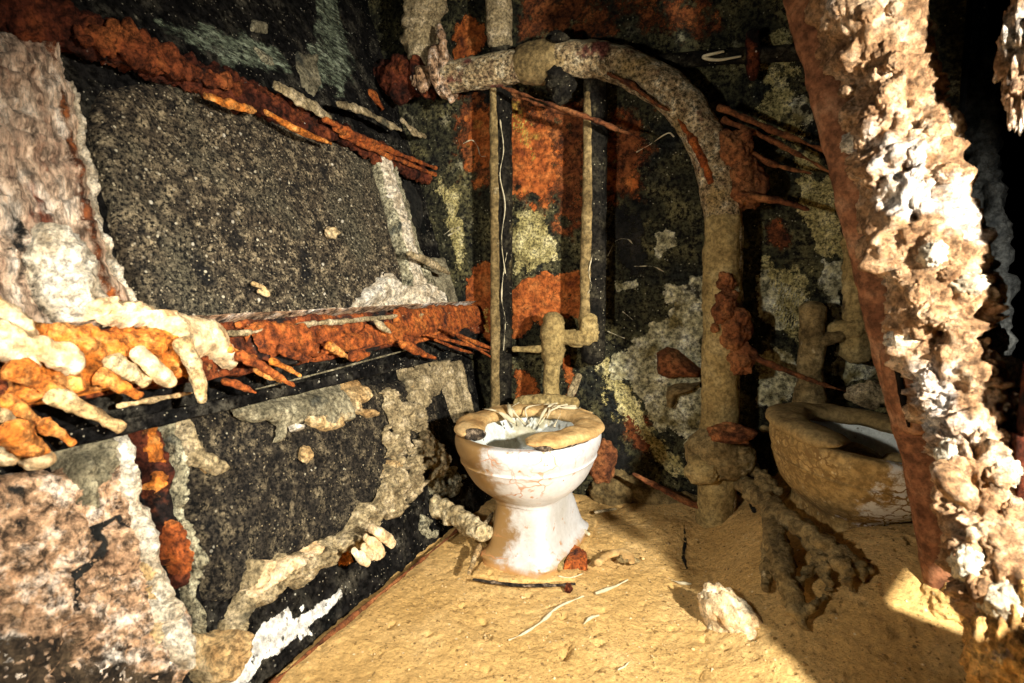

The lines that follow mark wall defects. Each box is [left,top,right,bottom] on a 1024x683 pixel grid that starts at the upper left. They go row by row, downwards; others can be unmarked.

rust [59,87,121,301]
rust [263,109,332,145]
rust [450,92,490,190]
rust [501,86,659,241]
spalling [7,219,53,321]
rust [227,261,491,387]
rust [512,270,580,339]
rust [0,321,189,471]
rust [221,378,257,393]
peeling [50,438,120,509]
peeling [142,427,169,493]
rust [159,520,195,577]